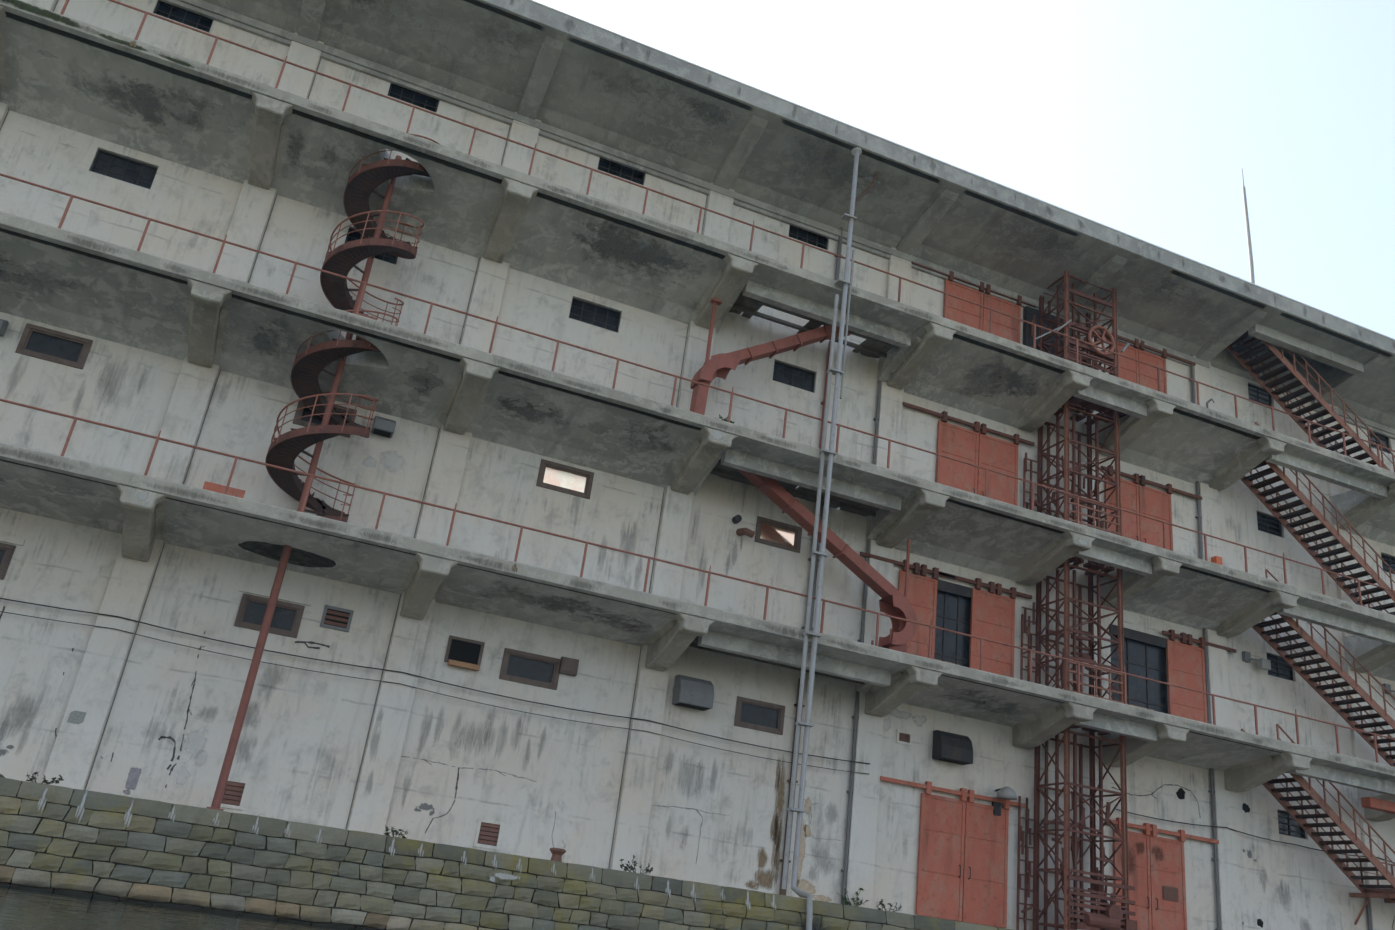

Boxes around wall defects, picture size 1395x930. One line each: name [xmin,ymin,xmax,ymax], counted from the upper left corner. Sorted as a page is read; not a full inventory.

crack [158,631,206,788]